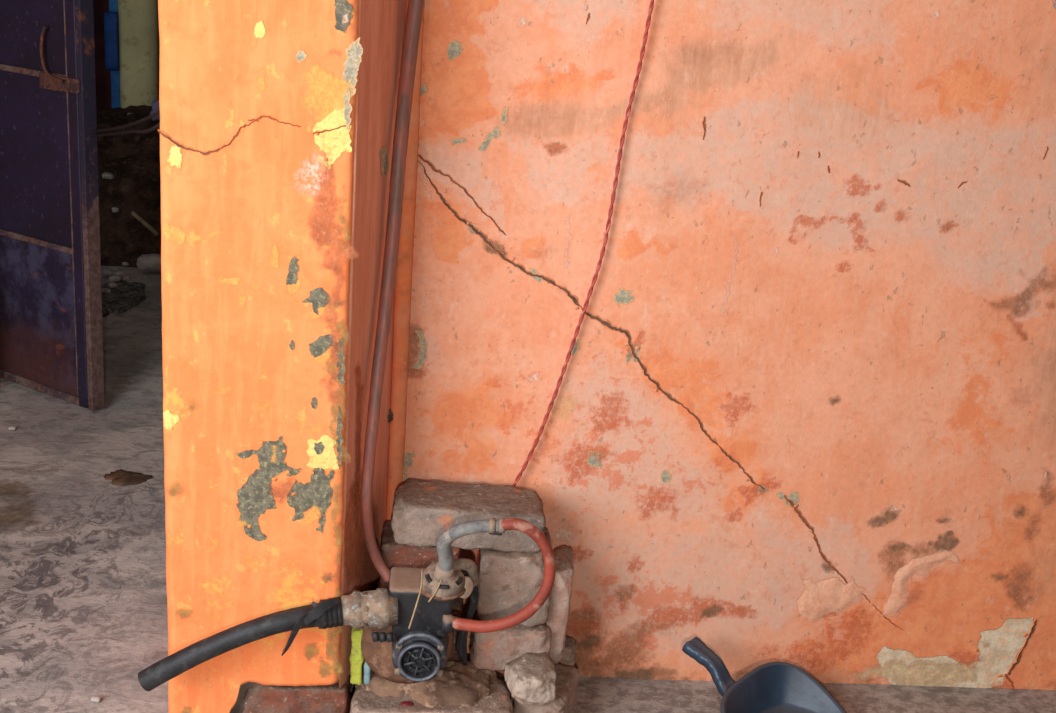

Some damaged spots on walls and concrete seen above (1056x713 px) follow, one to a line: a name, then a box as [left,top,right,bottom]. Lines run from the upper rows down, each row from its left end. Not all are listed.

crack [158,115,347,156]
peeling [235,322,350,545]
crack [418,154,903,630]
spalling [852,617,1034,689]